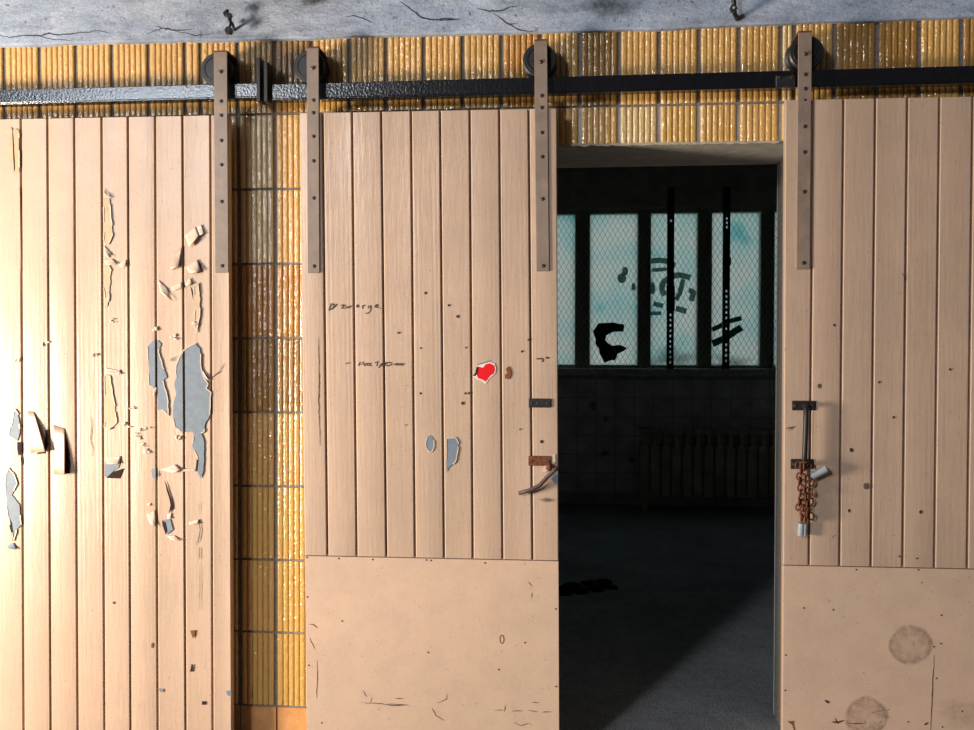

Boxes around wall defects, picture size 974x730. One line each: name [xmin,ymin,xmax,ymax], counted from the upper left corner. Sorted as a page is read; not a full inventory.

crack [0,30,107,41]
crack [147,26,207,36]
crack [401,2,533,32]
peeling [103,189,126,308]
peeling [146,225,211,541]
peeling [8,409,71,475]
peeling [425,435,459,470]
peeling [4,468,22,549]